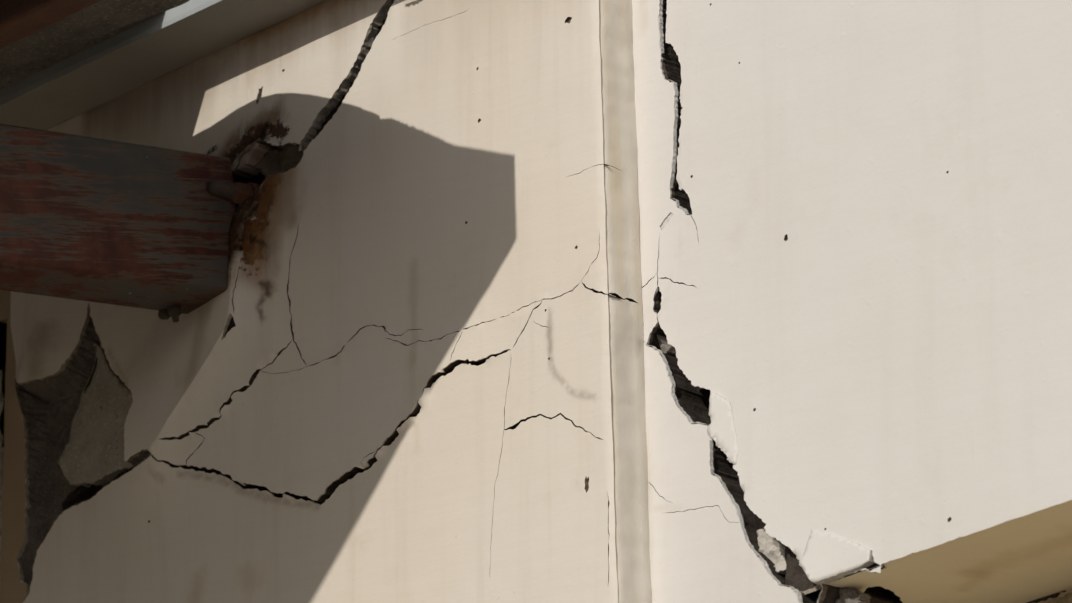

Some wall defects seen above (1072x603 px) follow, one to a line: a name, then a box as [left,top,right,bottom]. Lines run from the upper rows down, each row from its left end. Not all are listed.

rust [207,110,289,165]
spalling [231,138,308,186]
crack [299,0,467,151]
crack [658,0,699,241]
rust [228,172,283,275]
spalling [15,303,152,596]
crack [62,223,903,603]
spalling [784,545,822,595]
spalling [835,570,871,603]